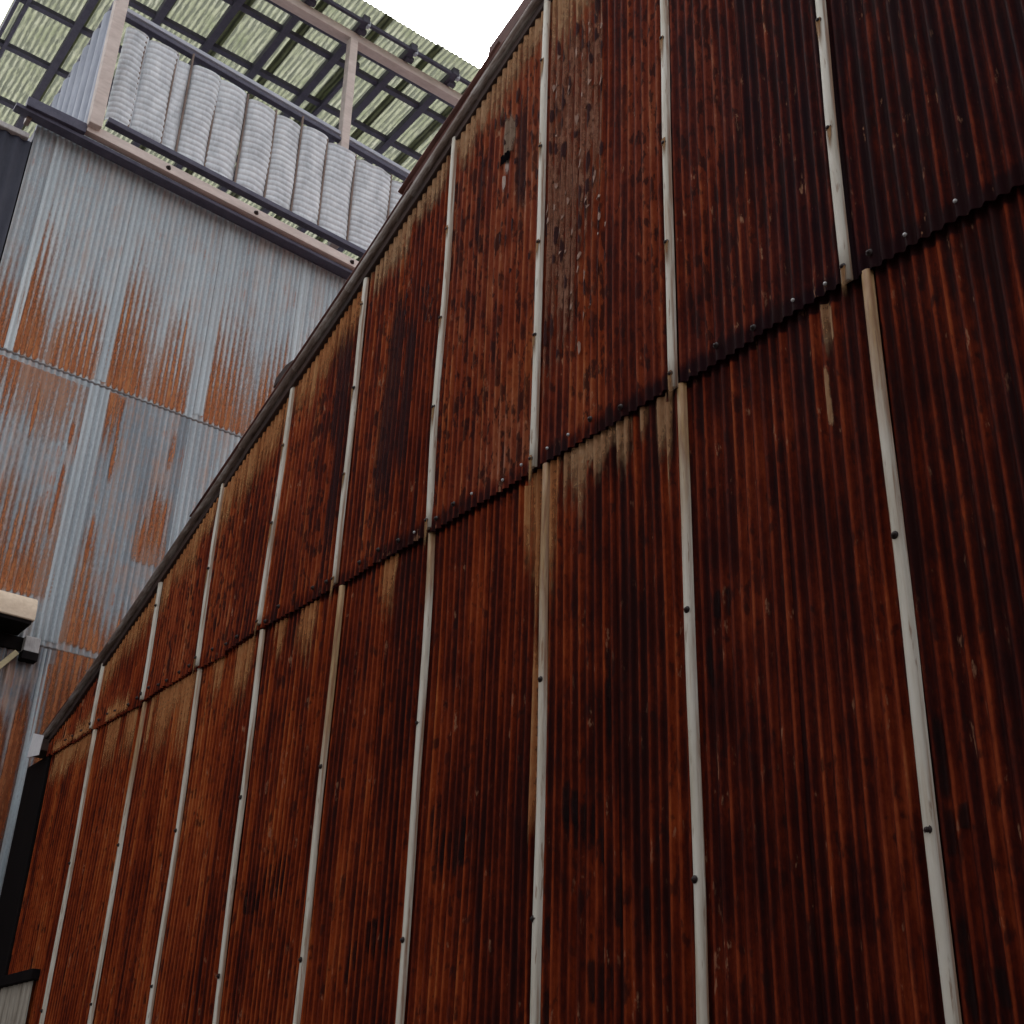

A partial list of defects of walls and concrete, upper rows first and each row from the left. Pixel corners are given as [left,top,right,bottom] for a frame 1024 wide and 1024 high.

corrosion [0,235,194,478]
corrosion [201,325,286,435]
water stain [103,0,583,692]
corrosion [0,465,65,597]
corrosion [132,490,167,567]
corrosion [524,455,559,598]
corrosion [0,518,121,840]
corrosion [528,650,548,829]
water stain [562,781,604,863]